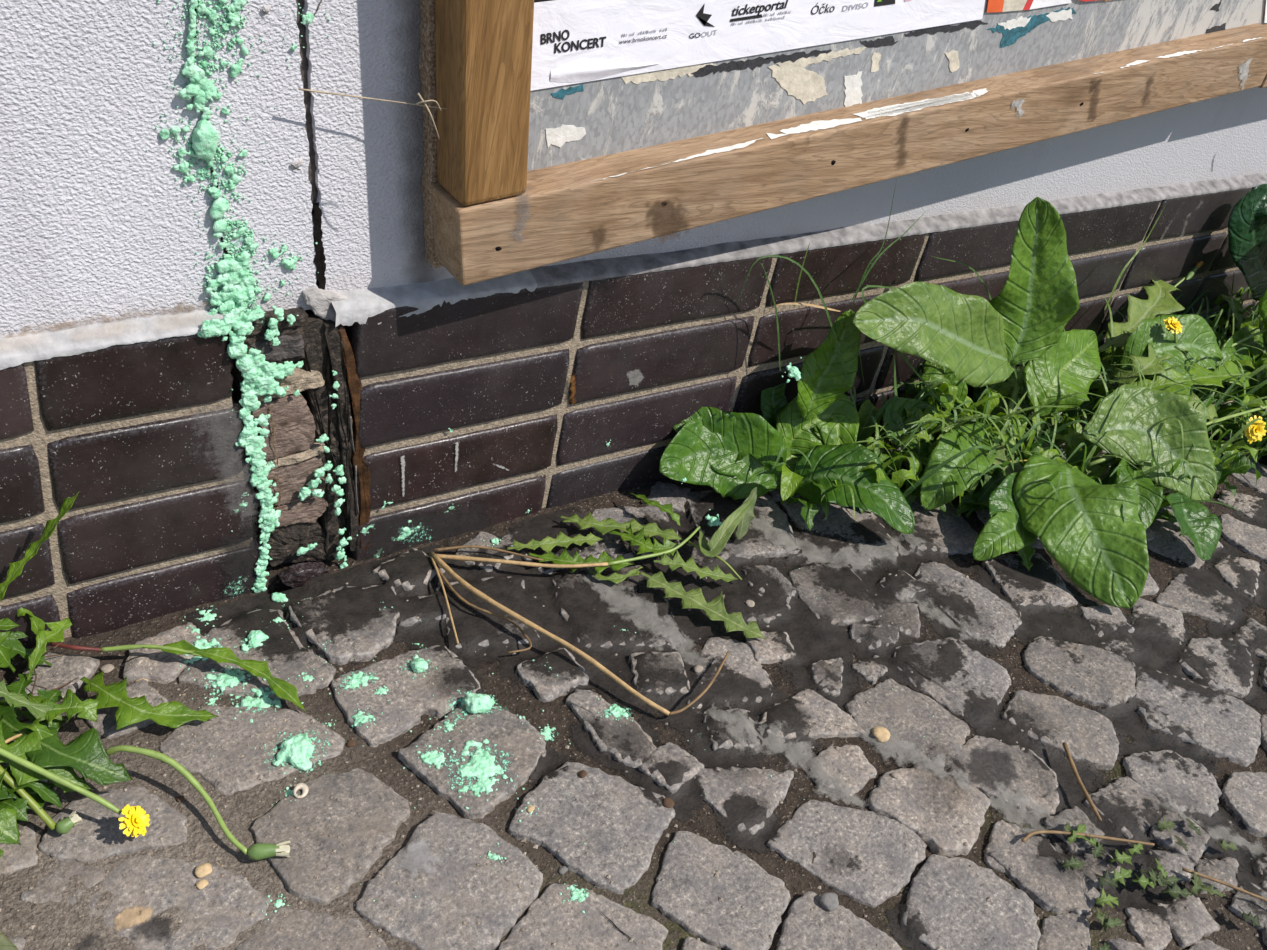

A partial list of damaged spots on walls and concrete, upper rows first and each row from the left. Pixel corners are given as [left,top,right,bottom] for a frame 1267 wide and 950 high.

peeling [197,4,249,78]
peeling [302,13,314,25]
peeling [184,150,248,199]
crack [296,0,326,290]
peeling [1048,173,1267,214]
spalling [0,203,1028,569]